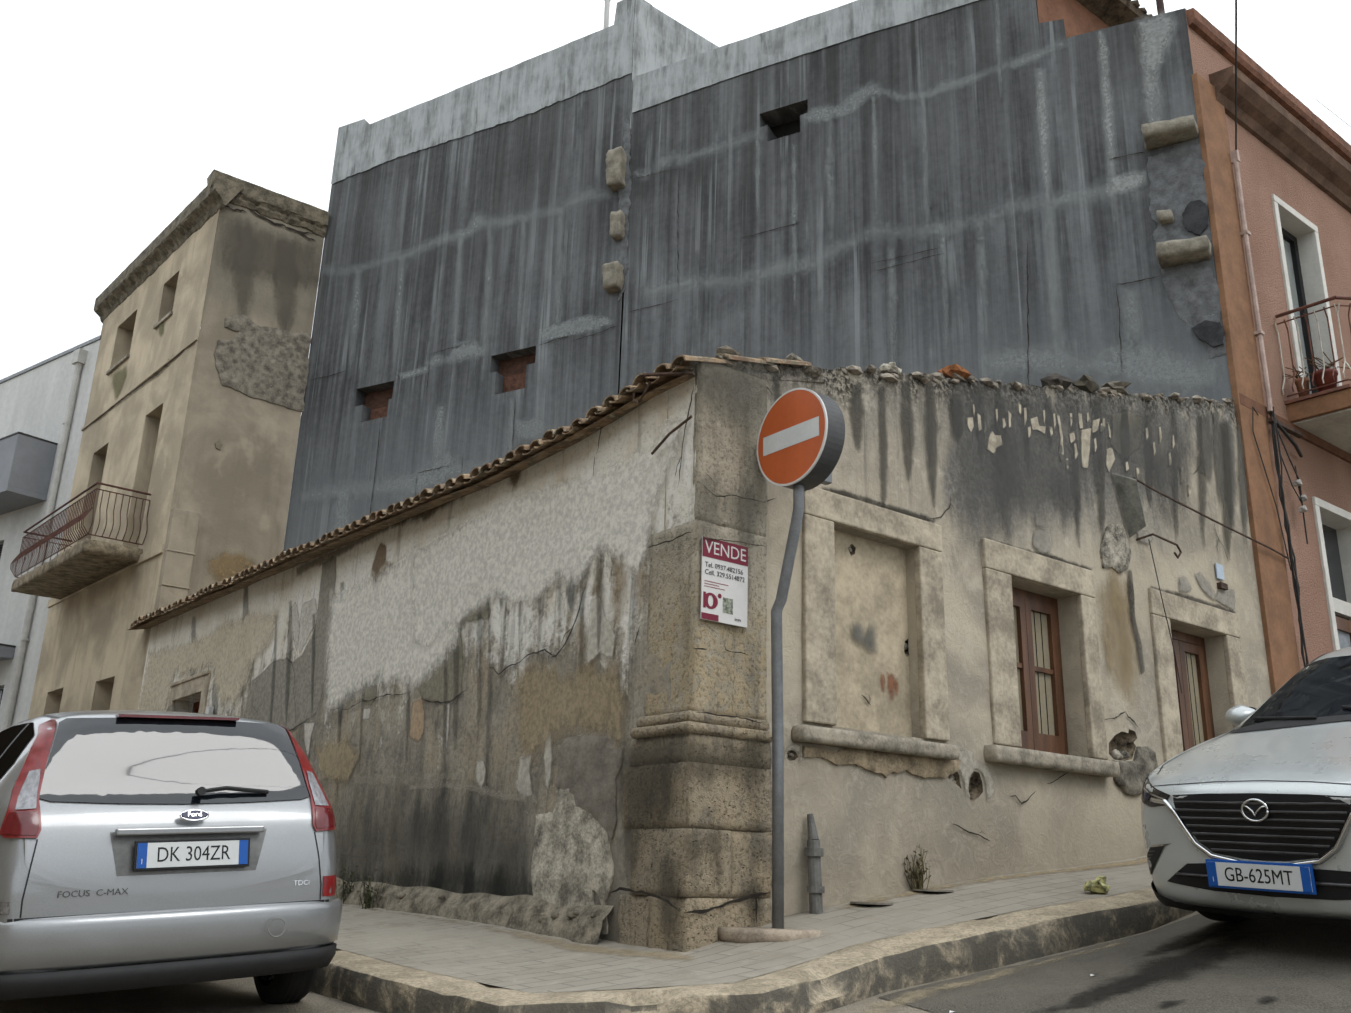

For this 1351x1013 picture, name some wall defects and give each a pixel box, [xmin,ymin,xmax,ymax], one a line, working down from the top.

water stain [223,222,318,330]
water stain [541,317,609,339]
flaking render [1147,142,1226,359]
water stain [823,385,935,522]
water stain [901,382,1004,501]
water stain [1094,401,1105,532]
water stain [1198,412,1248,558]
flaking render [363,685,377,719]
flaking render [409,601,490,749]
water stain [420,732,552,802]
water stain [587,597,615,663]
spalling [1109,729,1137,761]